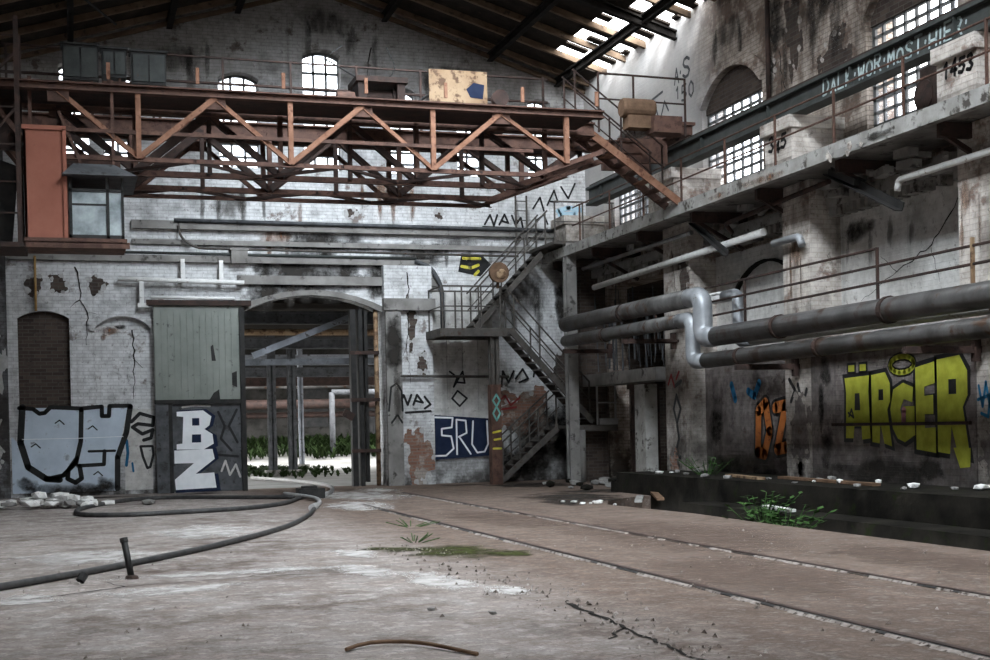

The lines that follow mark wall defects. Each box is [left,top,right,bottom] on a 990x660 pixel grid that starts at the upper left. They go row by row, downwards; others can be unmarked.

leakage [713,15,741,62]
leakage [770,0,787,80]
leakage [793,0,846,49]
peeling [24,273,70,298]
crack [74,267,95,345]
peeling [85,274,109,296]
crack [131,330,143,398]
spalling [395,427,628,534]
spalling [357,504,616,569]
spalling [636,572,692,588]
spalling [753,555,848,573]
spalling [773,605,990,660]